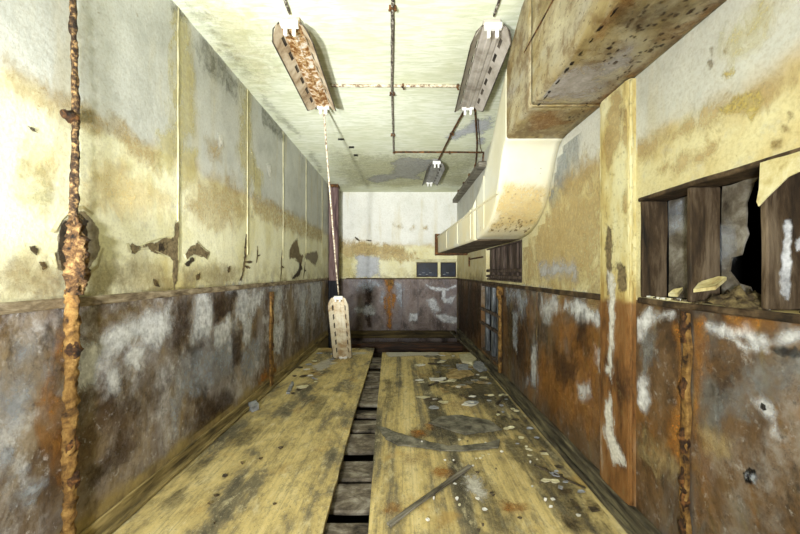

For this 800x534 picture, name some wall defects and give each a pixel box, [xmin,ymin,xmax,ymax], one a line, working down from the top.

rust [537,0,708,121]
flaking render [30,206,104,273]
peeling [126,220,210,290]
flaking render [290,238,318,279]
spalling [719,178,762,295]
rust [55,338,84,359]
damp [79,310,173,388]
damp [182,281,282,393]
rust [259,292,276,387]
damp [605,397,625,465]
damp [637,377,650,410]
rust [669,311,704,534]